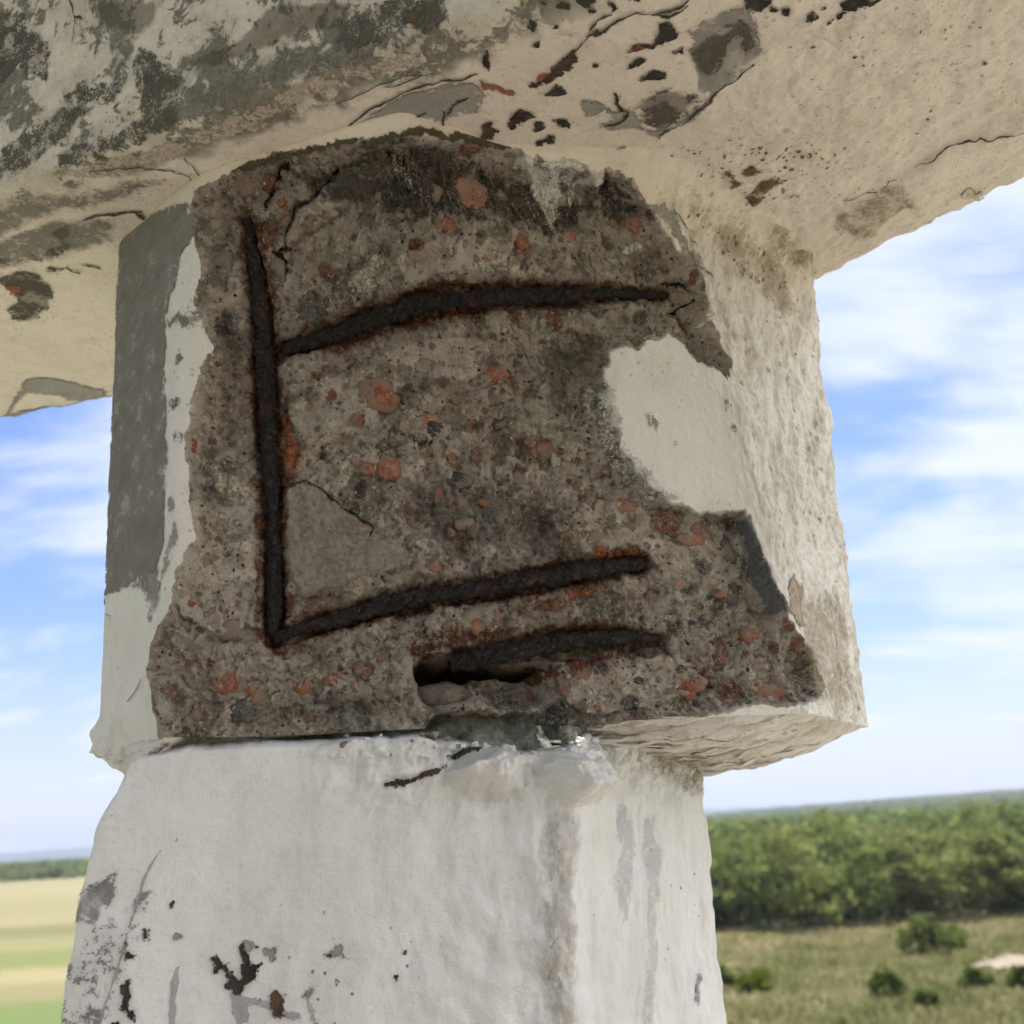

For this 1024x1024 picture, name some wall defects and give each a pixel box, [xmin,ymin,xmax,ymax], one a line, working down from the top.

mould [0,3,51,86]
mould [0,47,180,174]
water stain [202,0,449,104]
spalling [528,50,579,97]
peeling [582,0,790,138]
crack [264,163,339,274]
crack [844,133,1023,201]
spalling [0,82,826,760]
corrosion [235,215,669,675]
crack [289,480,374,537]
corrosion [515,647,656,686]
spalling [209,940,277,996]